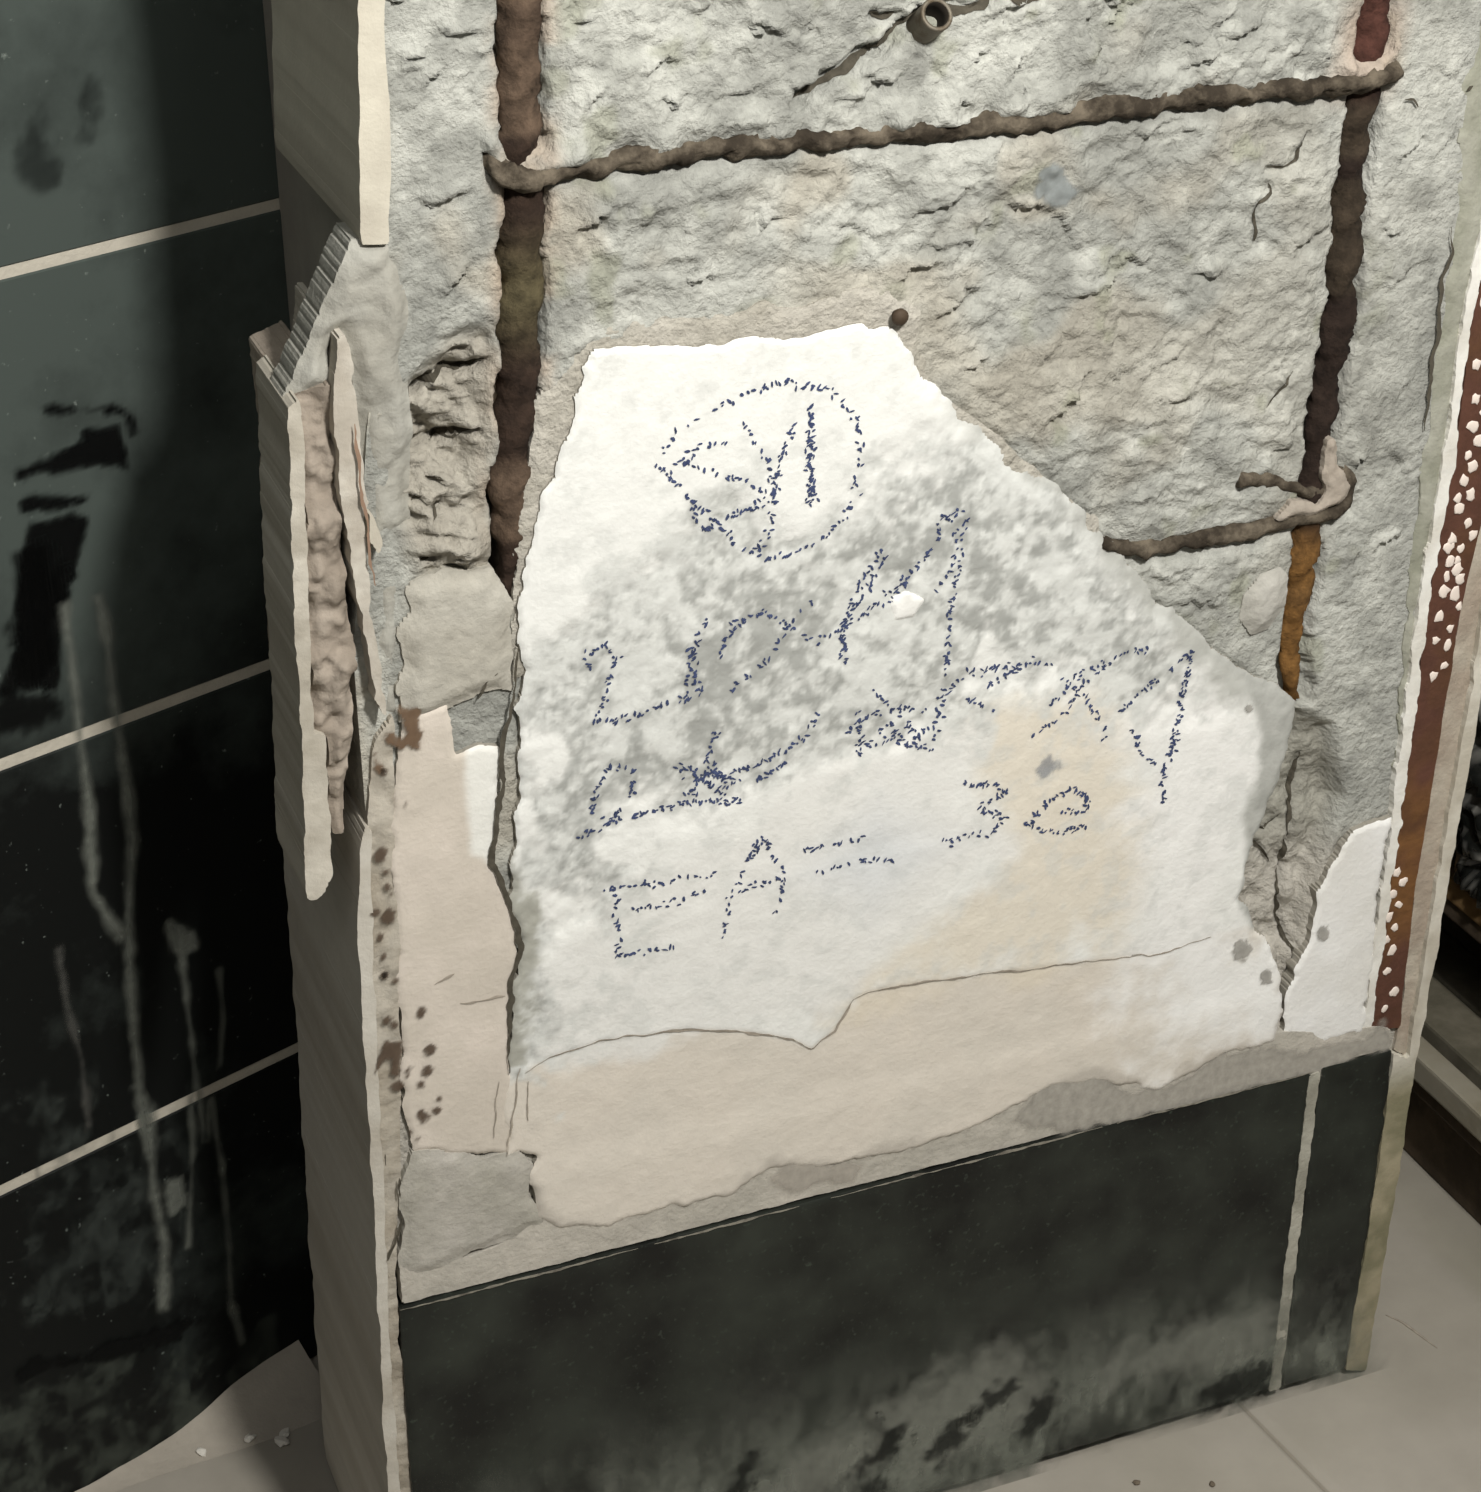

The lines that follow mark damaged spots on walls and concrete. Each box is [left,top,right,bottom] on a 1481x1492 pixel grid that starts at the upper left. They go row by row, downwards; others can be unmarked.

crack [793,0,1038,97]
flaking render [268,0,1481,1228]
crack [1253,752,1300,972]
leakage [660,1450,798,1492]
leakage [826,1351,1128,1492]
leakage [1183,1321,1339,1410]